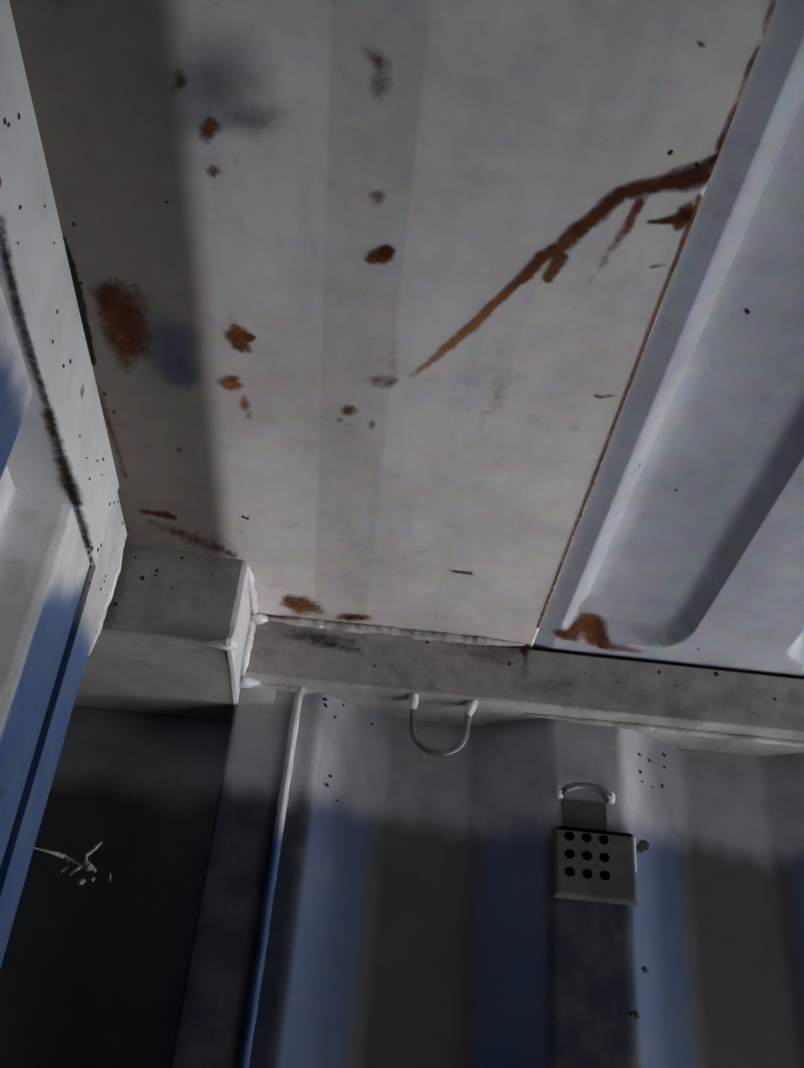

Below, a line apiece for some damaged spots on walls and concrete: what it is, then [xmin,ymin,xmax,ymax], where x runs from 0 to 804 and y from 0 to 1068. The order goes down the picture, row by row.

rust [366,245,395,264]
rust [96,285,149,367]
rust [225,326,255,353]
rust [417,0,778,628]
rust [284,597,323,615]
rust [556,614,640,653]